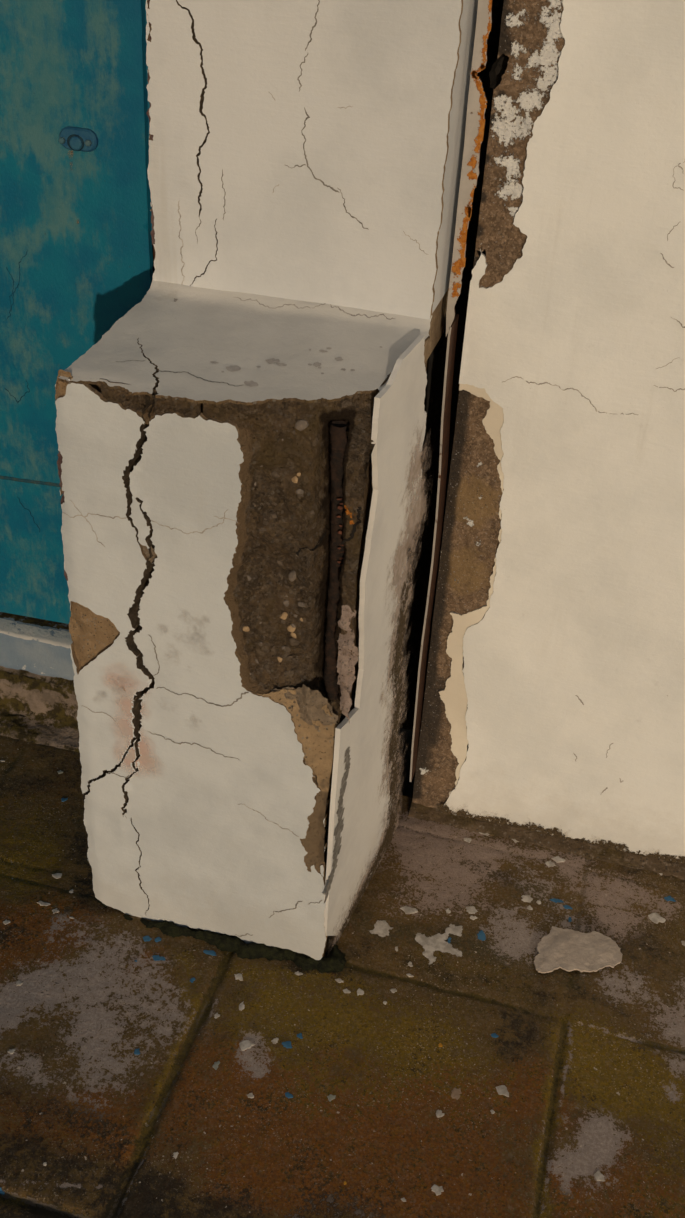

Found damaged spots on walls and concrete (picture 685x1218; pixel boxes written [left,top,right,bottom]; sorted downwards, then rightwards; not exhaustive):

crack [176,0,226,284]
crack [269,0,368,229]
corrosion [452,0,492,298]
peeling [473,0,565,288]
peeling [69,602,120,670]
crack [63,338,249,911]
spalling [90,373,391,873]
corrosion [337,498,355,564]
peeling [412,384,504,808]
crack [503,376,637,415]